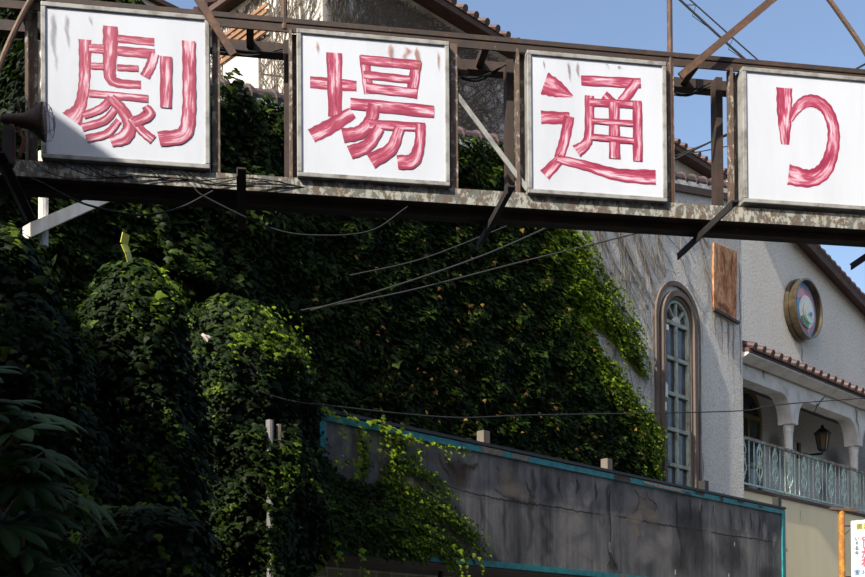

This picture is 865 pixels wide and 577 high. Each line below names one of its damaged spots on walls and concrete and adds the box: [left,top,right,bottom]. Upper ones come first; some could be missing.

crack [447,486,775,569]